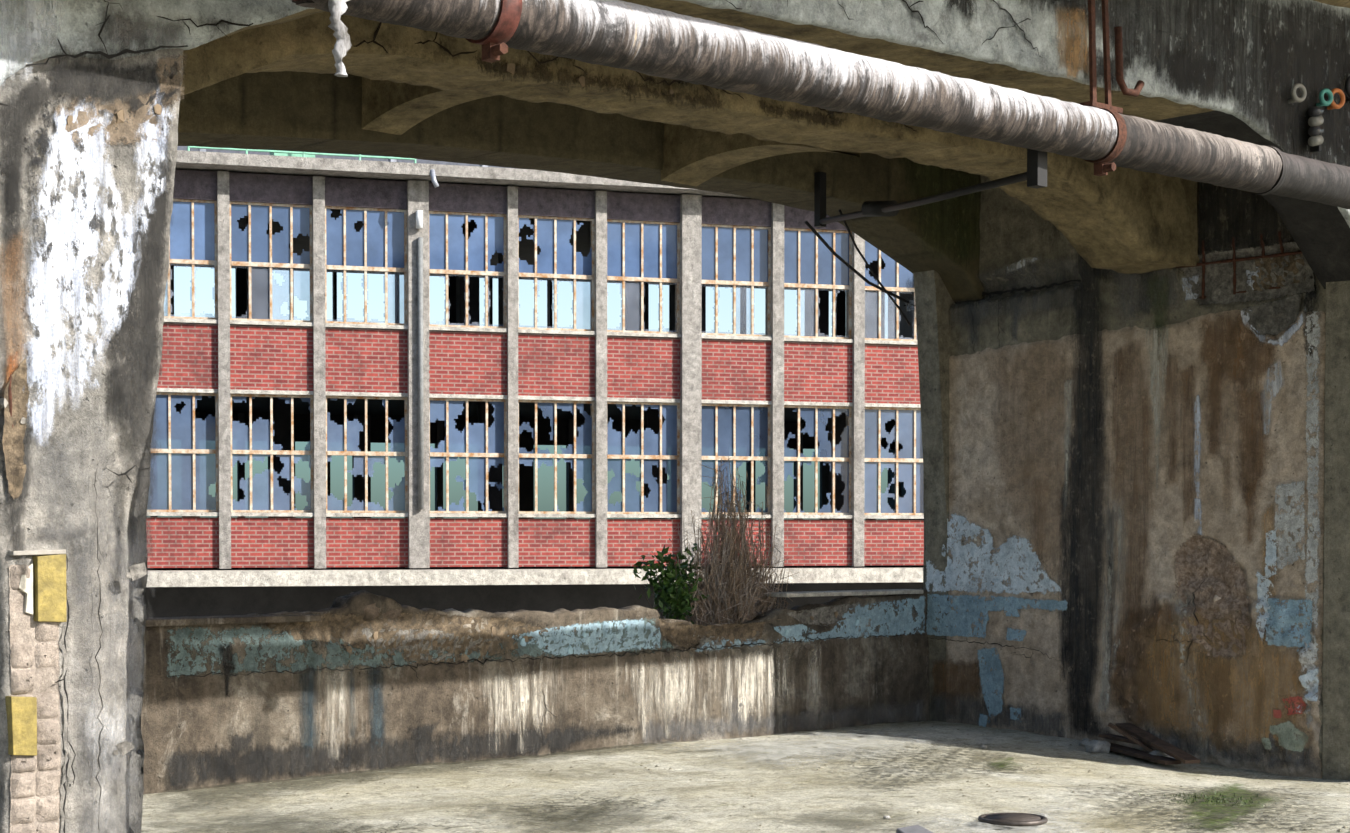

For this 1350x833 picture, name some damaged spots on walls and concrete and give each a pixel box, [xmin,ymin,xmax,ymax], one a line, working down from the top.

crack [26,0,254,66]
crack [354,22,477,57]
damp [948,0,976,19]
crack [982,0,1042,58]
damp [1029,0,1350,167]
damp [1197,182,1295,255]
damp [0,61,178,576]
peeling [166,513,1068,727]
damp [166,255,1317,833]
spalling [1173,242,1321,752]